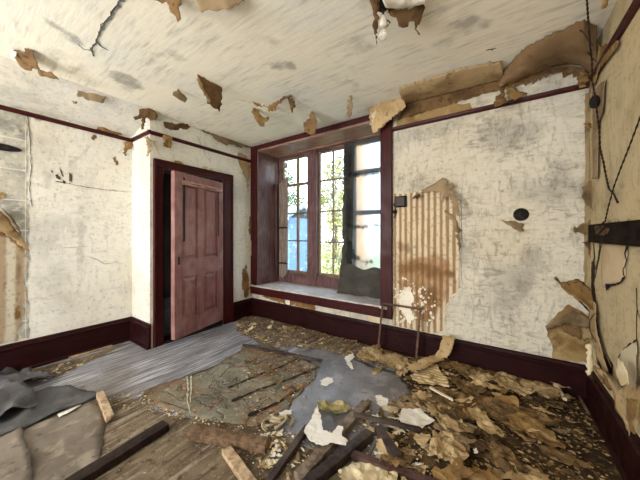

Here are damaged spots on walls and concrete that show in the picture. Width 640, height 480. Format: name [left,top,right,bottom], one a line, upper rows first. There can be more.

crack [79,0,125,56]
flaking render [396,103,473,126]
flaking render [0,106,30,340]
flaking render [393,191,460,333]
flaking render [545,304,600,363]
spalling [618,339,637,387]